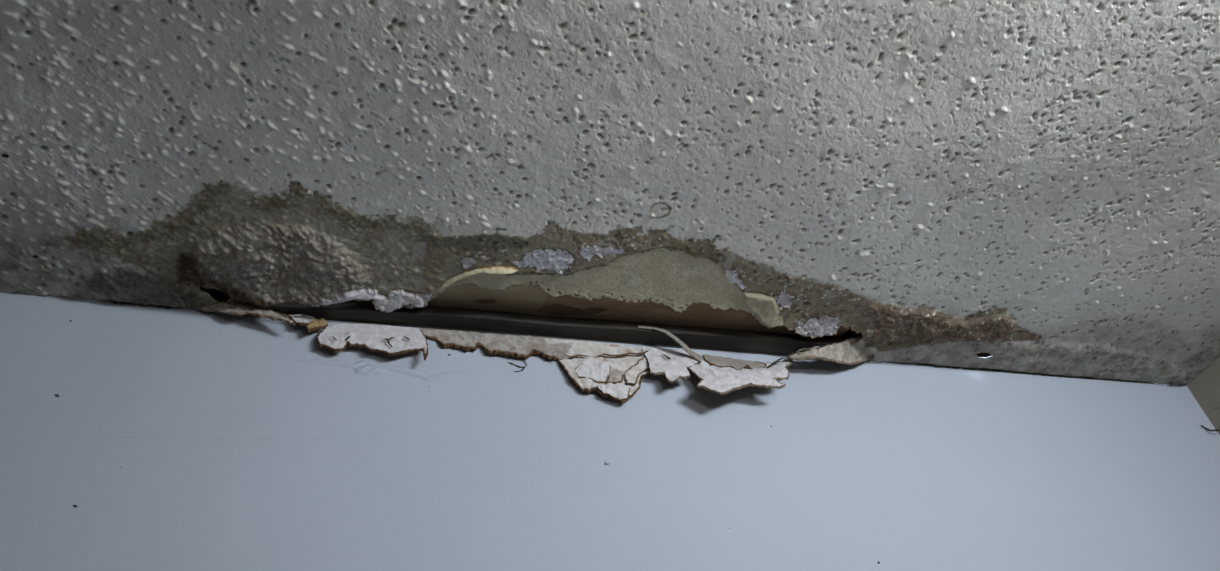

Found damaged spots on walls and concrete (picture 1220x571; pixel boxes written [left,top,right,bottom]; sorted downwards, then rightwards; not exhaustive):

peeling [197,245,875,404]
leakage [64,180,1041,351]